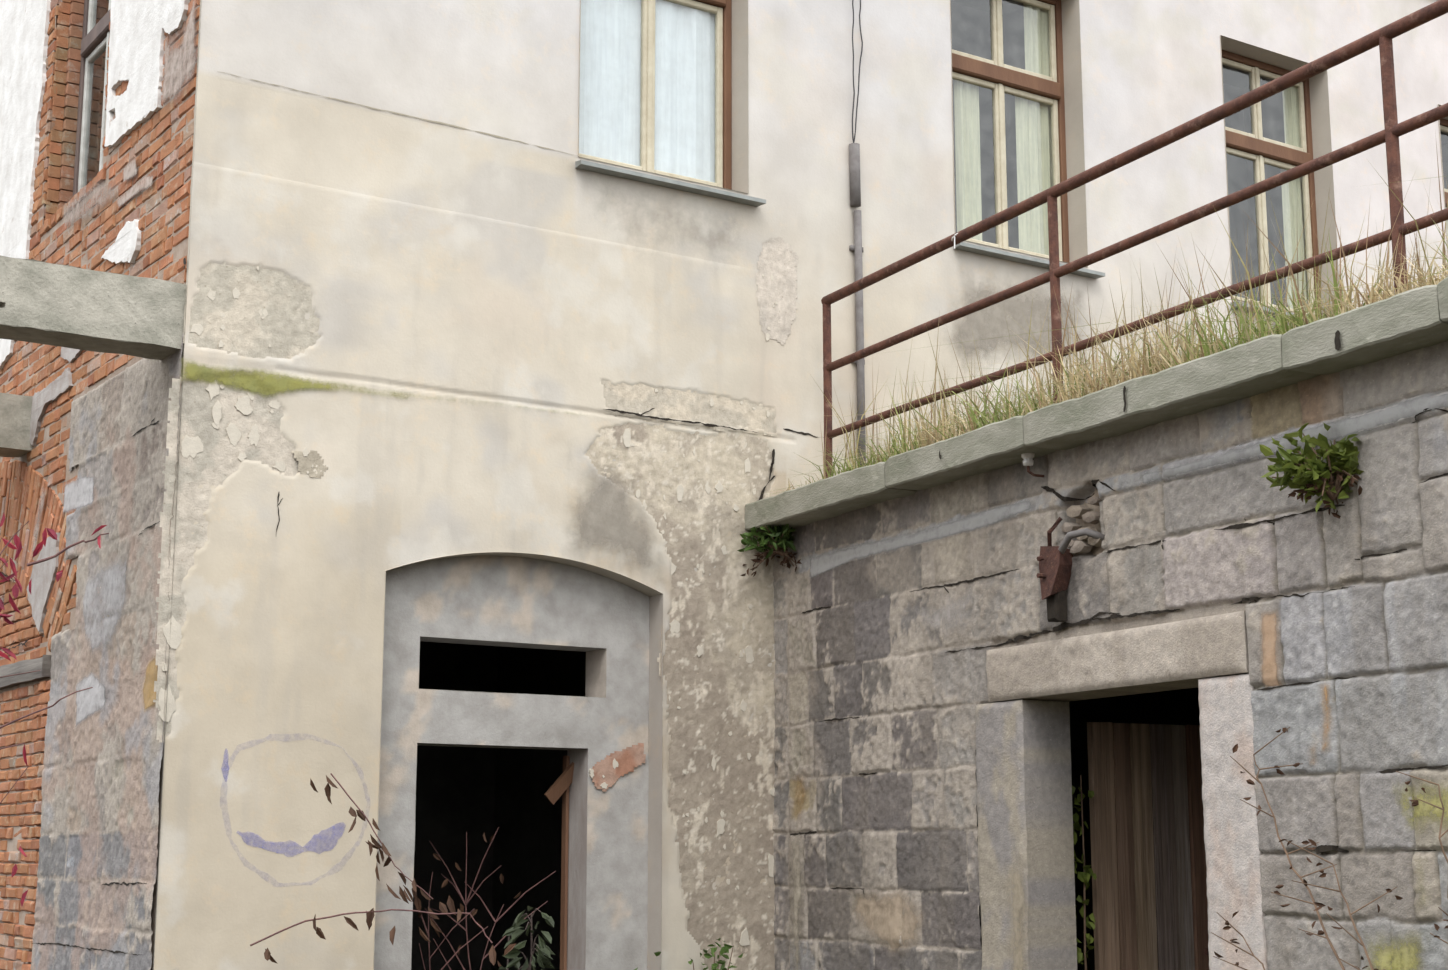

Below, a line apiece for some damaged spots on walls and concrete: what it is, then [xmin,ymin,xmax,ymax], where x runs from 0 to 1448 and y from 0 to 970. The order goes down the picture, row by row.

peeling [104,0,190,147]
peeling [0,0,51,259]
peeling [101,219,142,265]
peeling [0,339,15,370]
peeling [30,347,82,446]
spalling [183,262,321,359]
leakage [956,290,1071,357]
peeling [27,533,61,632]
peeling [153,377,328,743]
peeling [584,380,778,970]